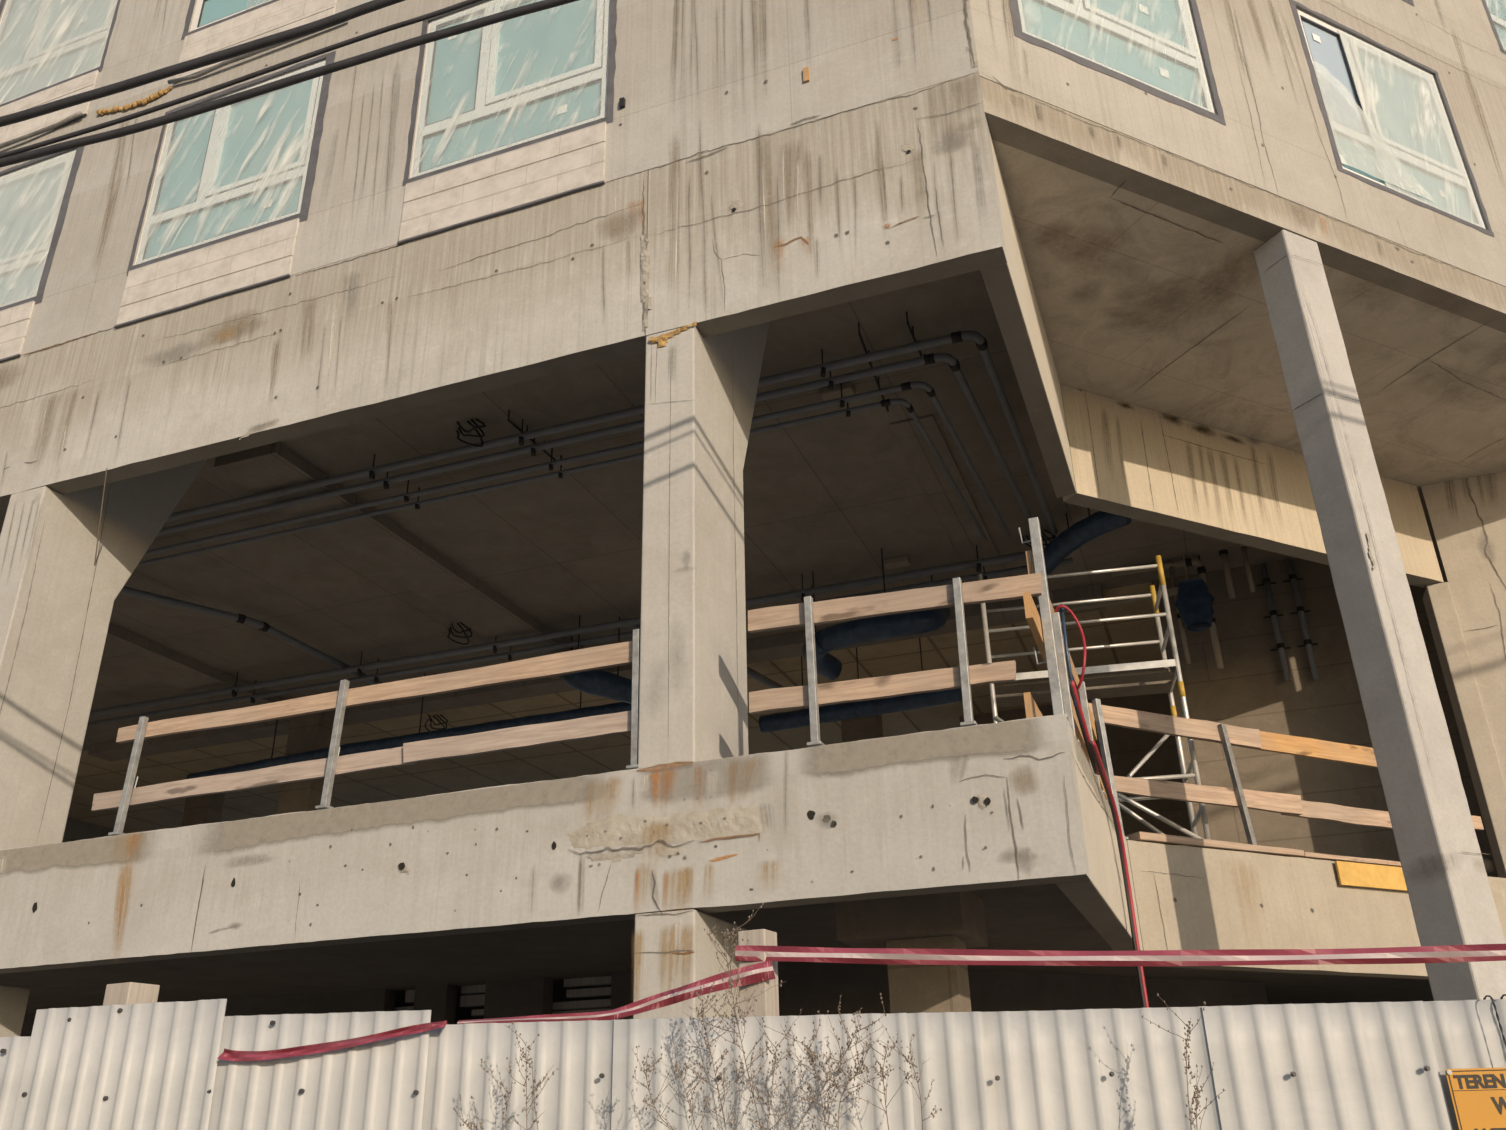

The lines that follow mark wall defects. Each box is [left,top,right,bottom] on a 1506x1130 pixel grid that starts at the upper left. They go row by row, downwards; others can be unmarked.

water stain [759,148,856,256]
crack [156,55,1502,367]
crack [1265,255,1504,529]
crack [1457,437,1506,657]
rust [117,867,132,923]
spalling [552,804,767,867]
rust [636,761,701,795]
crack [959,749,1205,949]